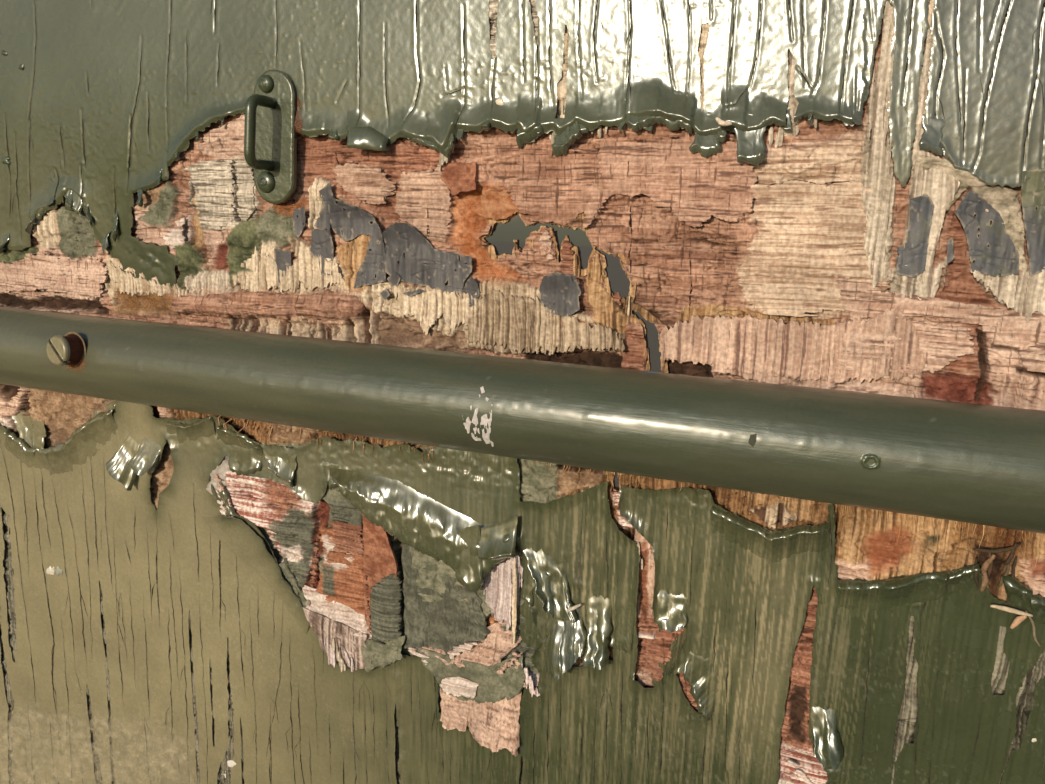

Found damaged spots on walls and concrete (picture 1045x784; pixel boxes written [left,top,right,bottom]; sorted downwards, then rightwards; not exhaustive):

crack [337,0,465,127]
crack [522,0,632,116]
crack [661,0,761,111]
crack [788,0,1011,172]
crack [1023,0,1045,167]
peeling [0,1,1045,410]
crack [0,442,492,784]
peeling [0,384,634,757]
peeling [517,458,1045,625]
peeling [809,707,849,784]
crack [891,603,941,784]
crack [964,626,1045,784]